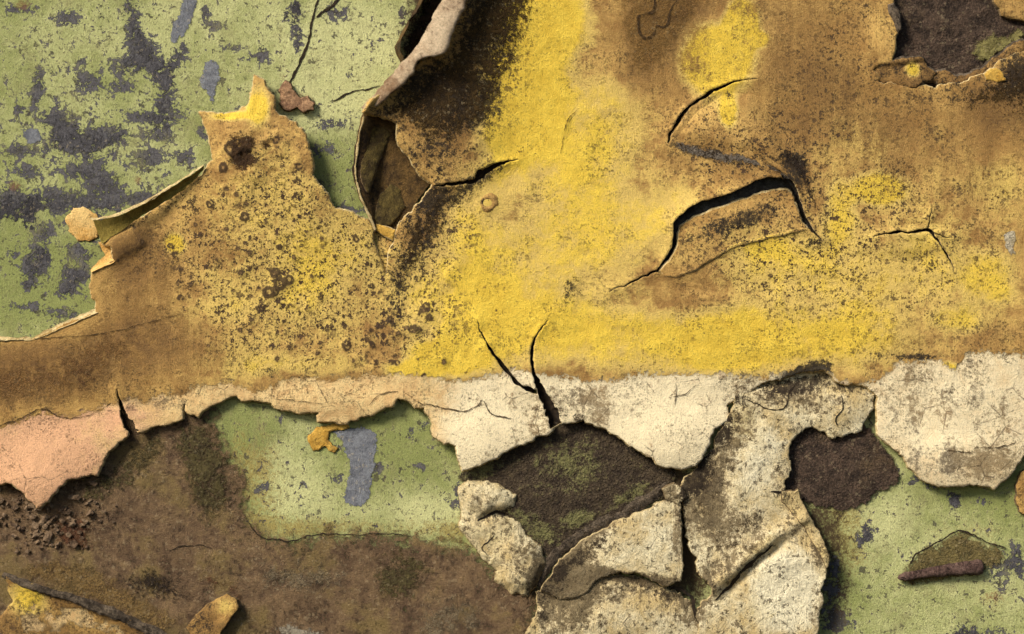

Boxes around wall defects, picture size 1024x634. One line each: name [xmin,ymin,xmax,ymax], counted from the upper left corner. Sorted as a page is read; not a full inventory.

peeling [372,0,467,106]
spalling [874,0,1024,88]
crack [668,79,751,160]
peeling [352,114,429,230]
crack [769,167,821,239]
crack [875,213,954,269]
crack [0,395,137,434]
crack [478,323,561,426]
spalling [457,421,677,597]
peeling [525,371,874,634]
spalling [784,423,900,511]
crack [668,545,773,623]